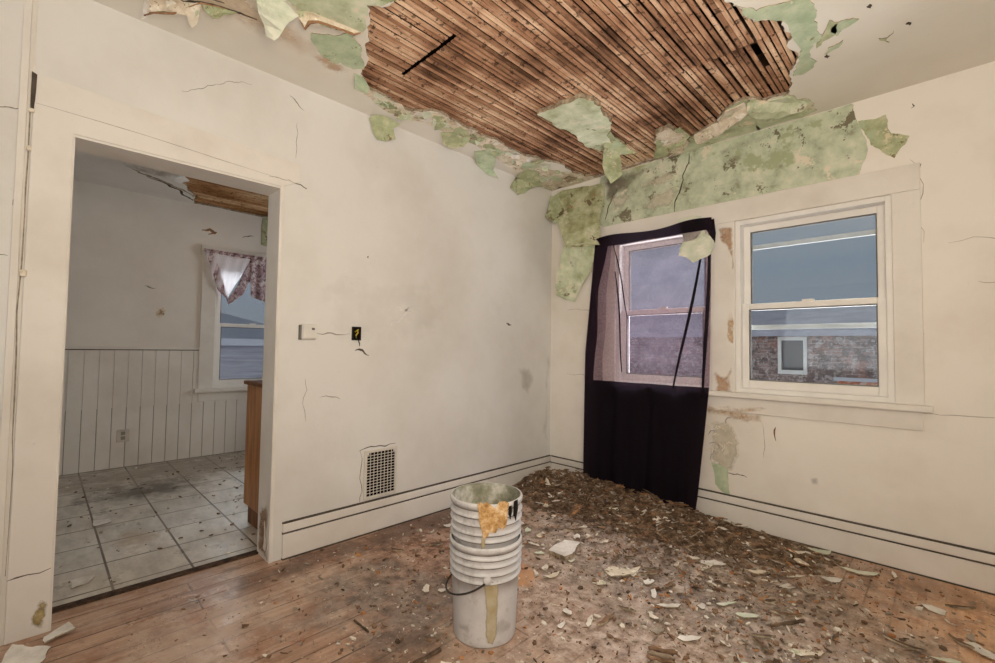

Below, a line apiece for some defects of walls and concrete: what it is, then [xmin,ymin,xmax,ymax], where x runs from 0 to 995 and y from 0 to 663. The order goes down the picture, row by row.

peeling [256,0,909,302]
peeling [711,462,746,494]